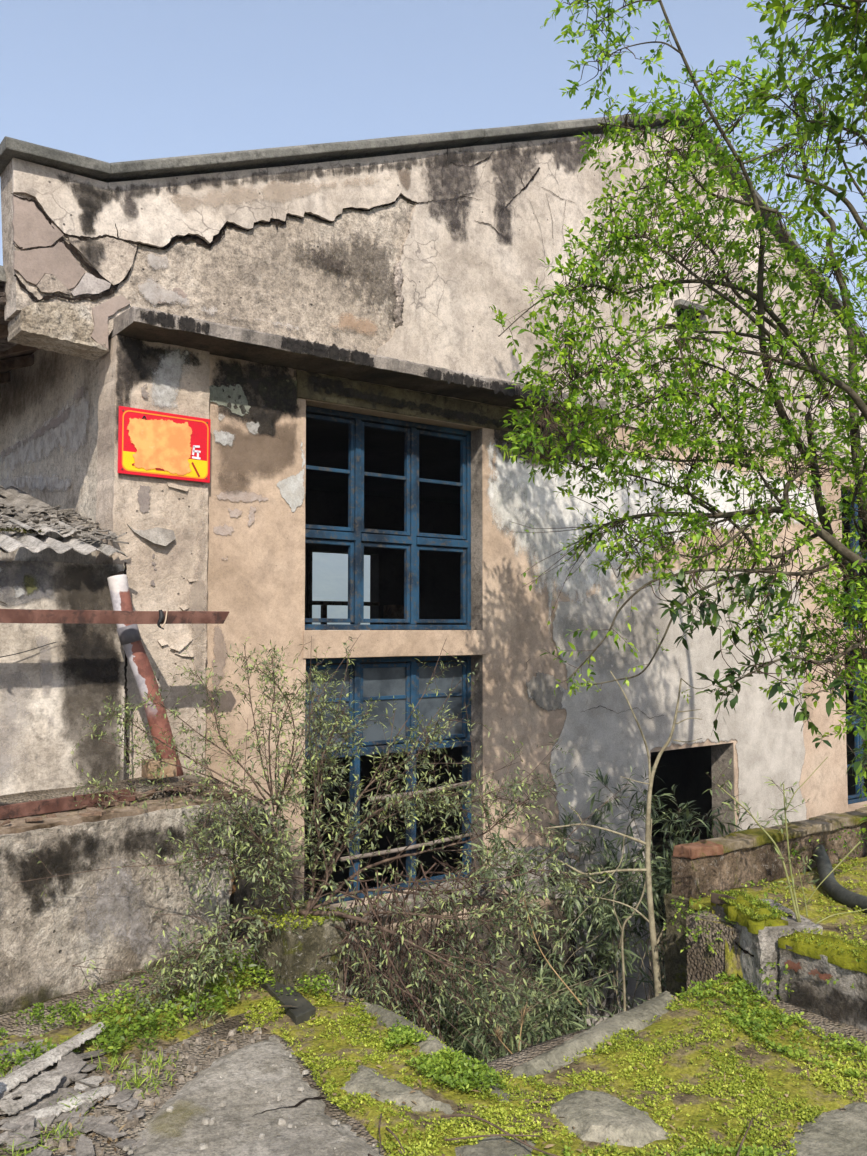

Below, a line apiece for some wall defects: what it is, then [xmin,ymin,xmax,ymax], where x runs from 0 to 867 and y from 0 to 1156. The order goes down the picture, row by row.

flaking render [12,194,137,349]
leakage [115,336,201,440]
crack [11,148,572,302]
leakage [258,319,374,367]
leakage [58,135,590,266]
flaking render [292,232,404,327]
leakage [209,359,608,492]
flaking render [127,524,176,546]
peeling [157,442,306,727]
peeling [488,442,824,616]
leakage [0,557,122,786]
leakage [3,813,228,913]